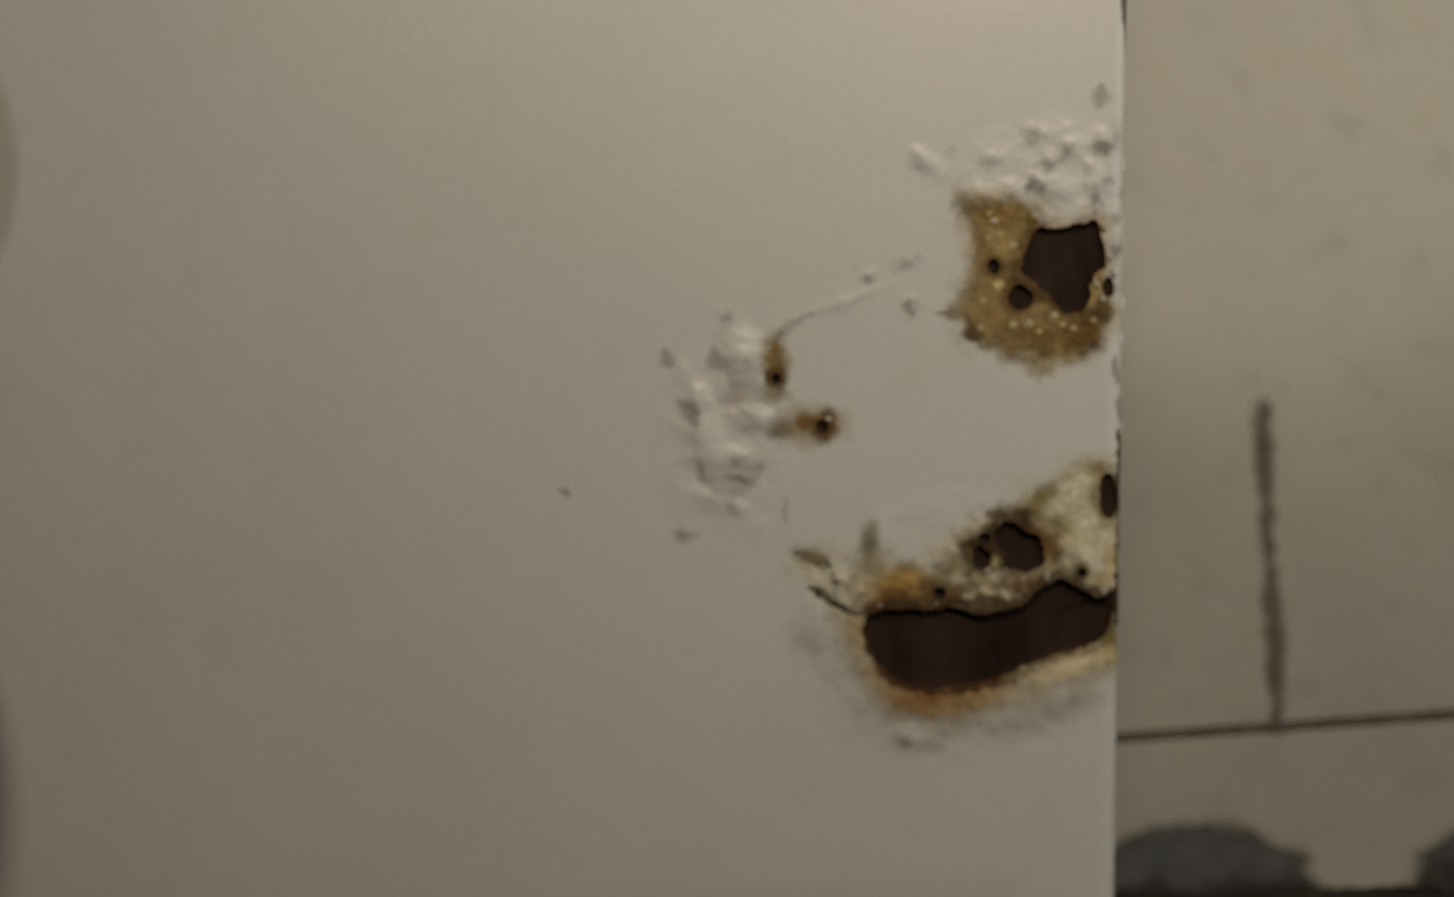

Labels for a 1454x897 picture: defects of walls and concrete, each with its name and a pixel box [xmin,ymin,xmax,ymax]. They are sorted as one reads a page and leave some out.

spalling [988,260,1000,274]
rust [940,195,1115,361]
spalling [1008,221,1116,313]
rust [763,340,787,398]
rust [772,408,839,441]
hole [1100,474,1117,517]
rust [803,429,1121,721]
hole [972,522,1044,573]
hole [864,568,1113,689]